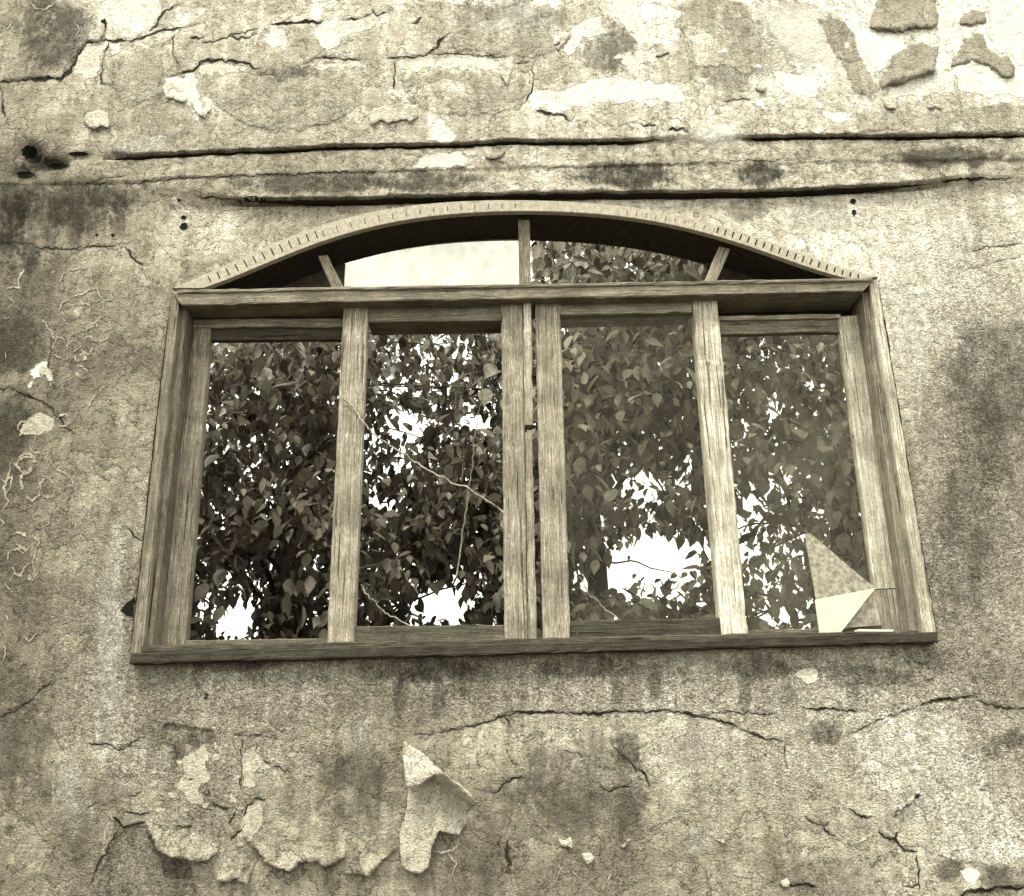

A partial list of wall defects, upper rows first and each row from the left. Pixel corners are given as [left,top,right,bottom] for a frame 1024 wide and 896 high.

crack [0,5,386,116]
flaking render [162,61,250,118]
crack [42,33,1024,206]
flaking render [528,0,691,112]
flaking render [754,0,1024,123]
crack [804,695,1024,737]
flaking render [95,744,222,896]
peeling [228,742,476,877]
flaking render [216,869,253,886]